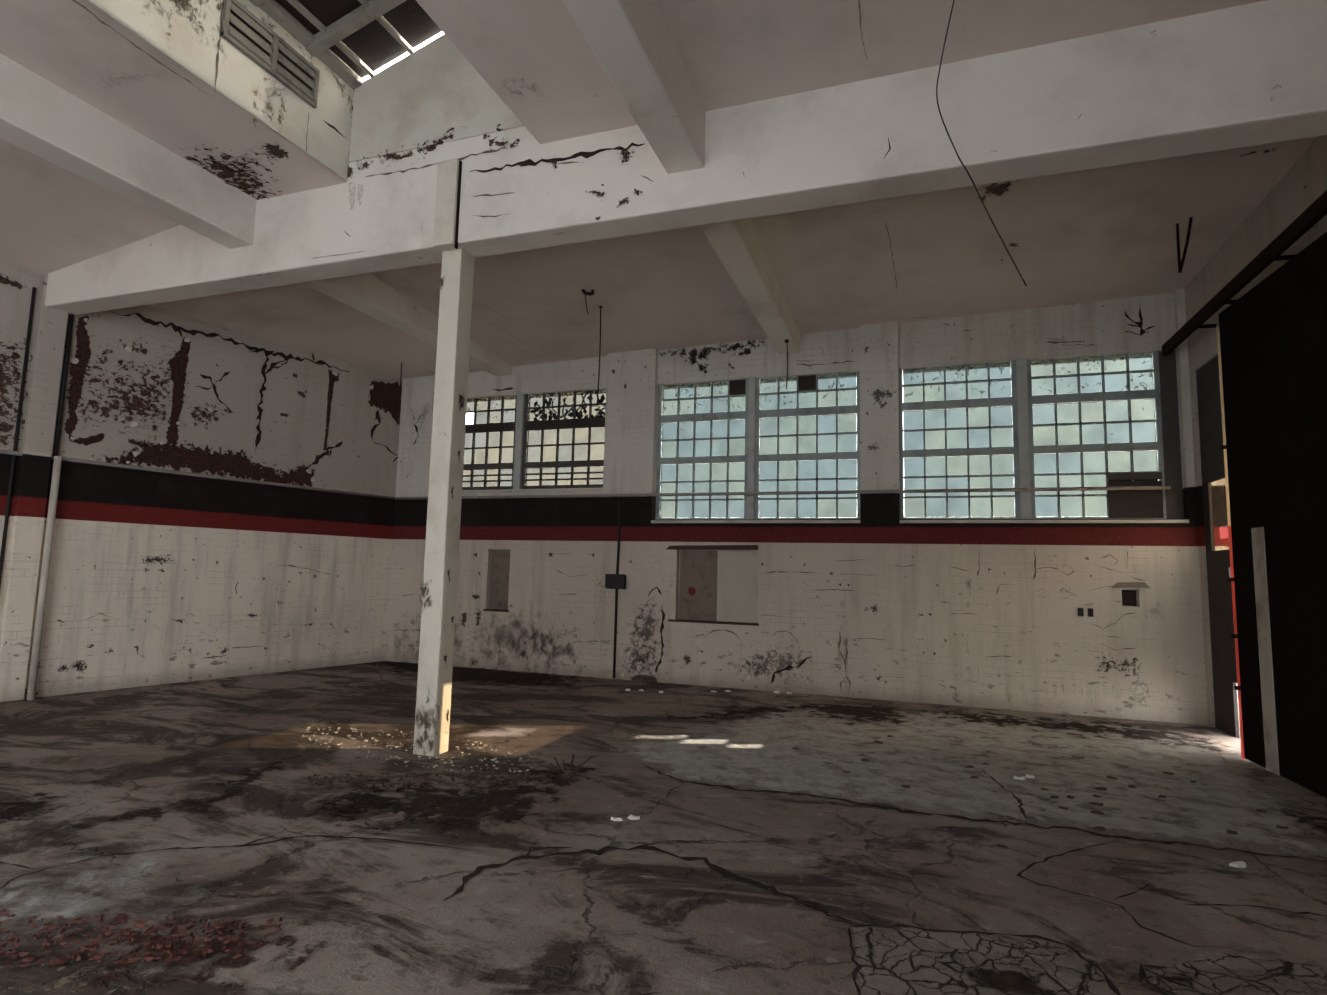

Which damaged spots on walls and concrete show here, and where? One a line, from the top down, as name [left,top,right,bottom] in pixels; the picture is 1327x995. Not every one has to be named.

flaking render [185,143,288,200]
crack [470,143,653,217]
flaking render [0,338,33,459]
flaking render [64,315,316,488]
flaking render [323,369,339,451]
leakage [364,661,418,677]
leakage [452,667,581,686]
crack [0,834,443,889]
crack [444,764,1327,995]